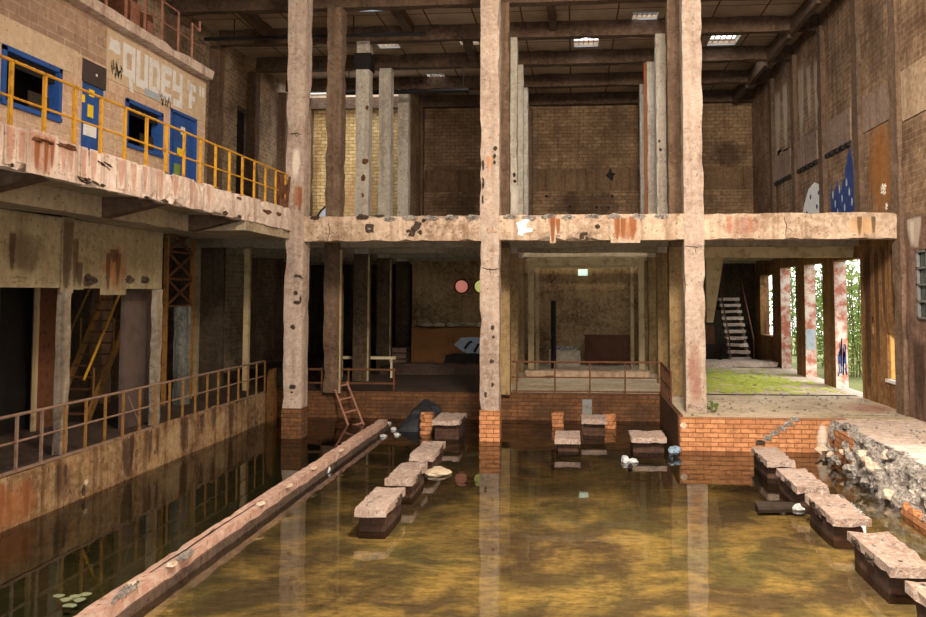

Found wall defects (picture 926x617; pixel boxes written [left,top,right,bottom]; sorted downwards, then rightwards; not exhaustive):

rust [26,127,59,179]
rust [546,215,562,243]
rust [610,214,640,243]
rust [0,469,45,538]
spalling [814,420,926,535]